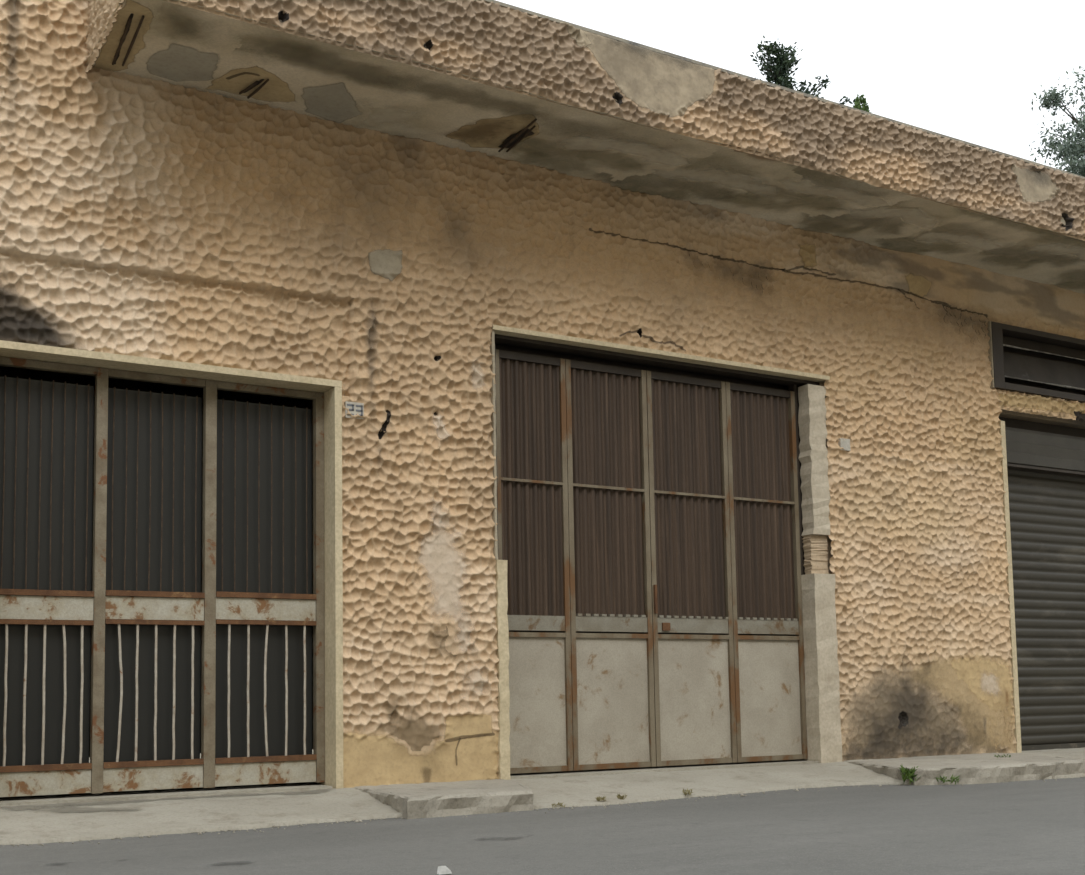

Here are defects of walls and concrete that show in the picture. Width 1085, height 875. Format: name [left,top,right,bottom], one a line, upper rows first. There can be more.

peeling [560,22,715,117]
crack [589,228,988,317]
corrosion [0,589,316,600]
peeling [420,503,472,648]
corrosion [0,754,317,773]
peeling [343,714,499,788]
leakage [858,682,971,754]